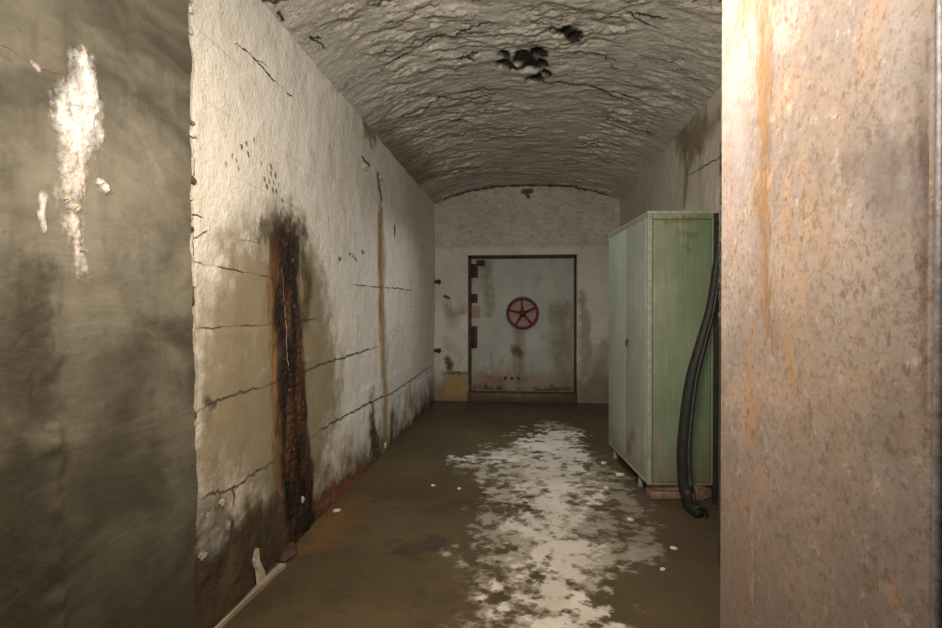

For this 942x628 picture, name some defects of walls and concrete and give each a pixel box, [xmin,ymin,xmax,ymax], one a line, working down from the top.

crack [236,43,294,100]
crack [299,35,325,49]
crack [380,21,492,70]
crack [605,11,670,29]
crack [382,87,498,129]
crack [542,81,654,137]
damp [400,421,660,628]
damp [194,492,292,628]